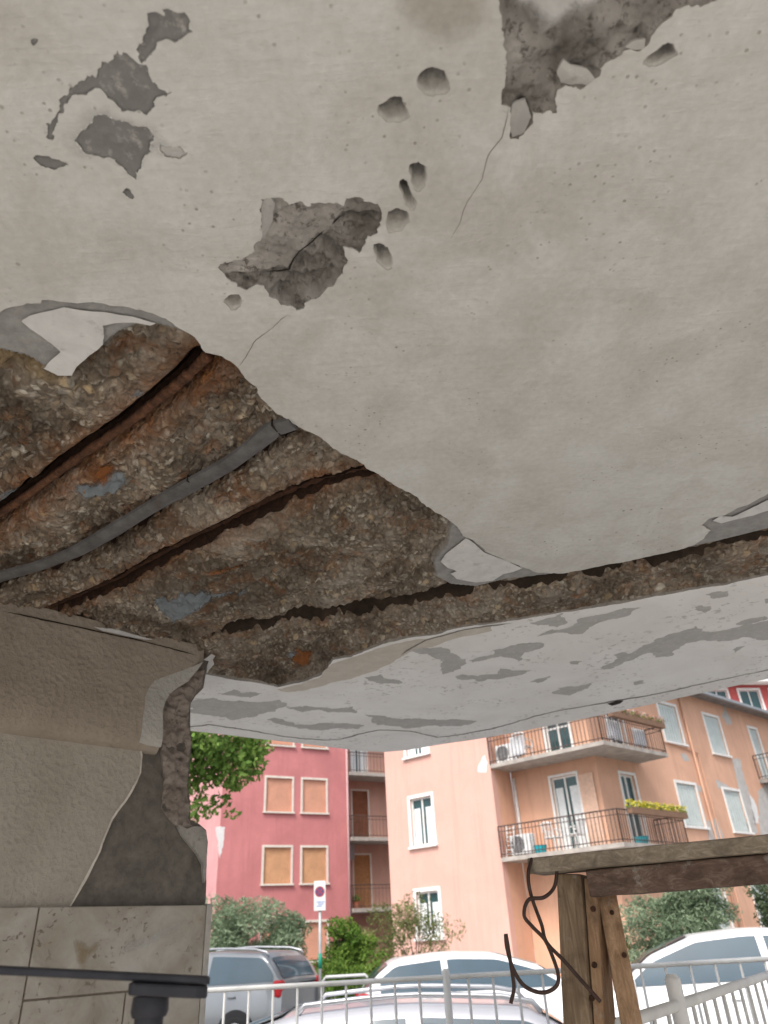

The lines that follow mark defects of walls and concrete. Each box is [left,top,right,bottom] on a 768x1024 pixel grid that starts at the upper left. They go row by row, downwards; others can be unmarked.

flaking render [34,155,67,170]
flaking render [46,9,192,199]
flaking render [218,162,427,311]
flaking render [377,96,410,123]
flaking render [416,67,450,97]
crack [451,107,509,238]
flaking render [499,0,716,139]
spalling [0,300,768,907]